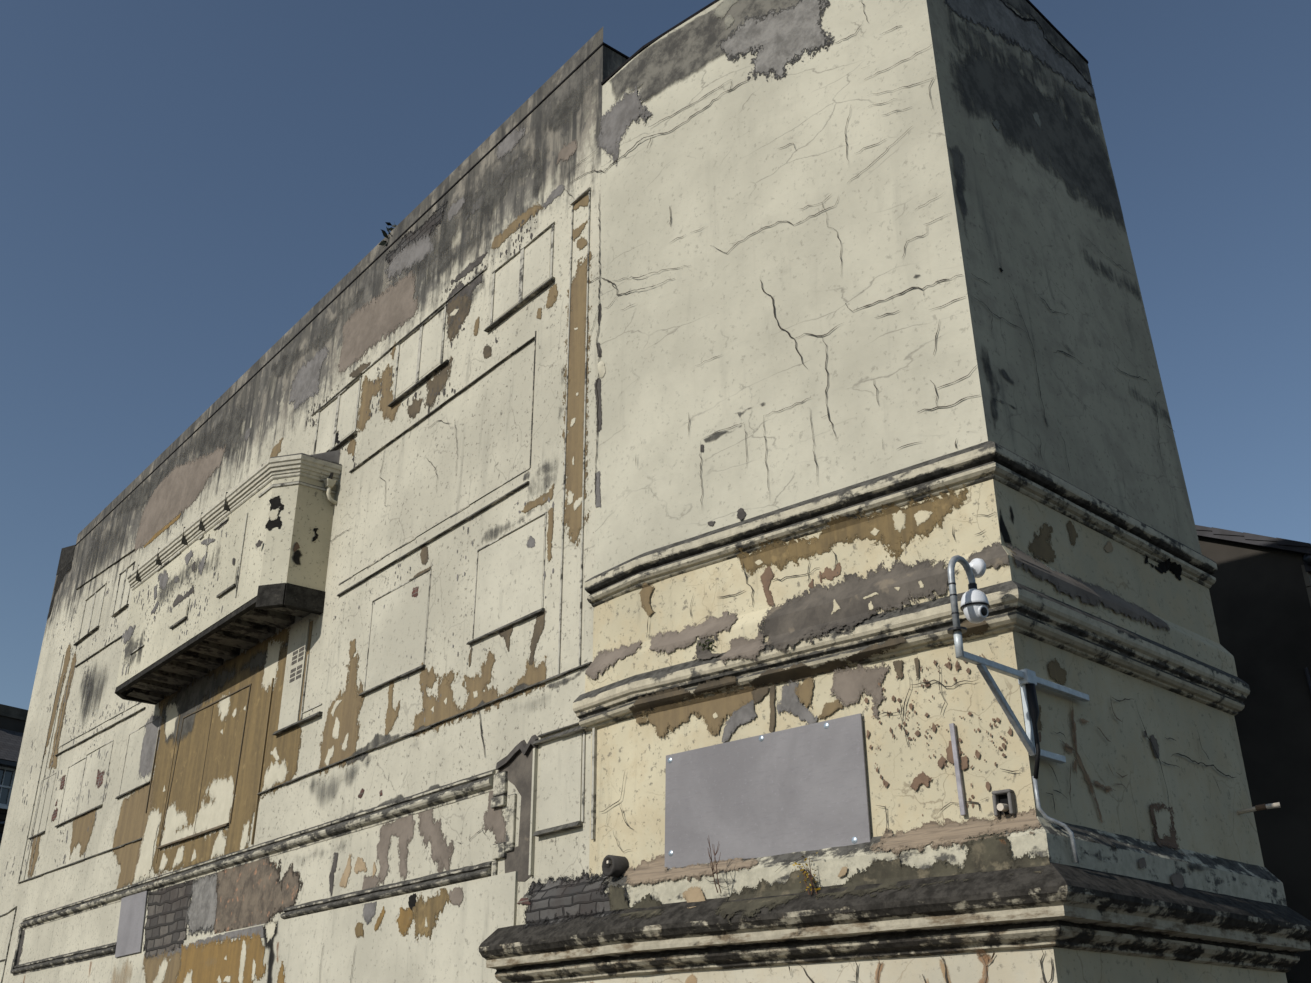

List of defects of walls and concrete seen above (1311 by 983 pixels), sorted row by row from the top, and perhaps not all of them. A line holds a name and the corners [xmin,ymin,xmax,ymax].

leakage [610,0,799,101]
leakage [949,0,1125,227]
leakage [47,404,244,619]
leakage [272,290,362,377]
peeling [289,185,565,467]
peeling [506,195,602,579]
crack [567,0,933,501]
crack [688,241,1174,504]
peeling [112,596,547,983]
spalling [517,483,1170,932]
crack [922,947,995,983]
crack [1040,946,1053,983]